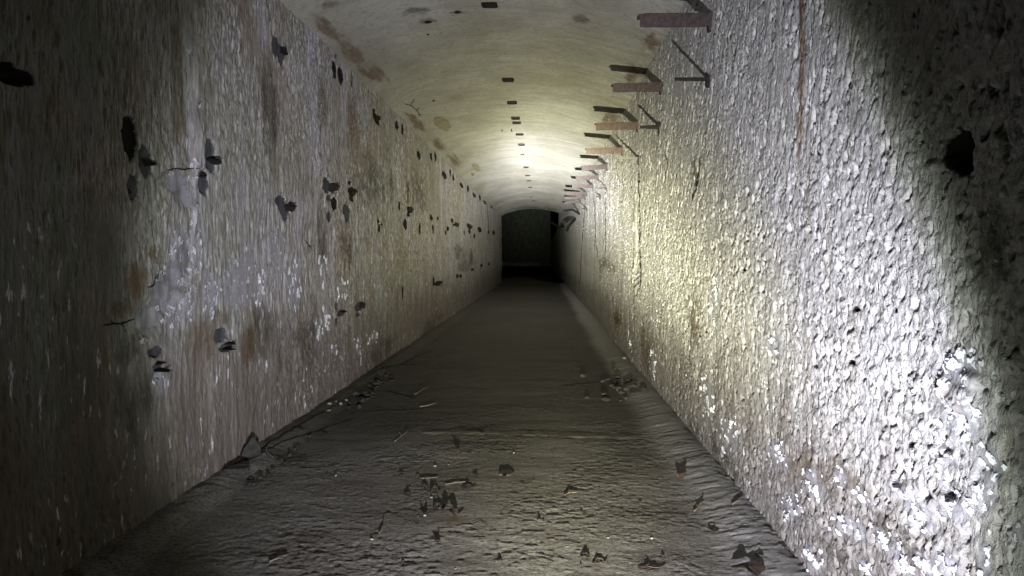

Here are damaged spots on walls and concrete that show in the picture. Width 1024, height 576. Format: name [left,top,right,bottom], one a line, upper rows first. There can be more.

spalling [271,36,289,65]
spalling [0,62,33,87]
rust [795,0,807,163]
peeling [120,116,222,208]
spalling [943,130,975,176]
spalling [275,195,297,221]
spalling [322,177,358,222]
leakage [155,202,302,358]
crack [102,318,135,332]
peeling [135,237,198,382]
spalling [214,328,236,352]
leakage [828,346,1007,576]